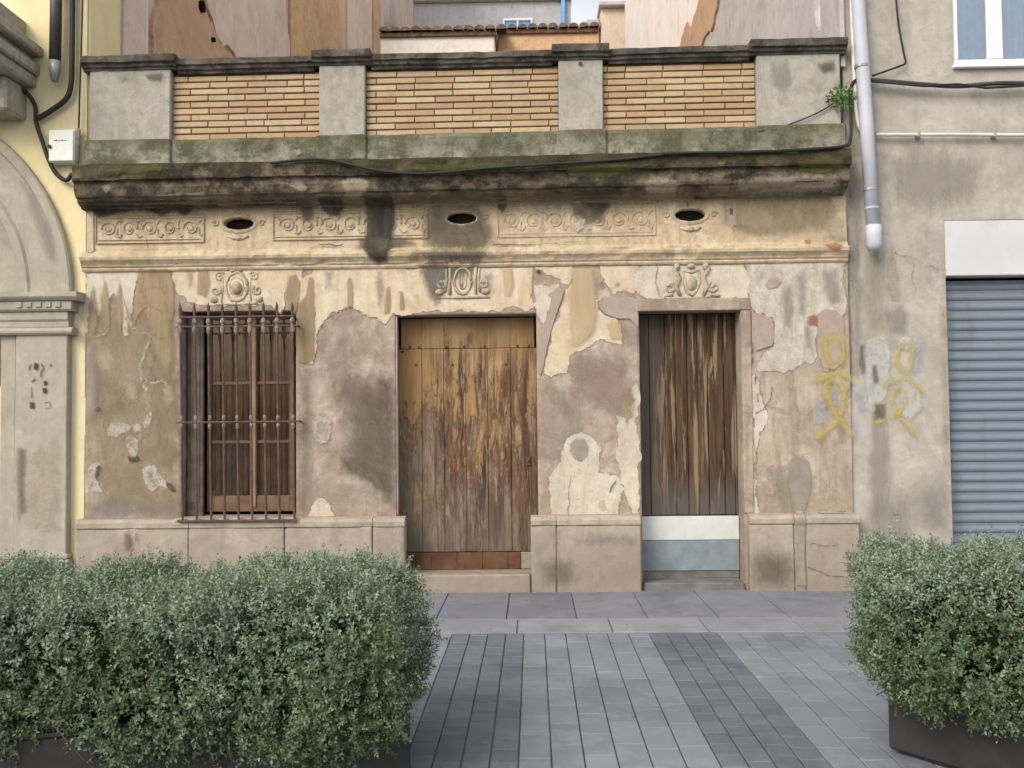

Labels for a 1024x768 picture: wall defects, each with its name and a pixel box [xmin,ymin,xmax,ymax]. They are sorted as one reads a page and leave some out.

leakage [360,195,411,264]
flaking render [82,271,138,333]
flaking render [172,262,847,518]
spalling [87,462,103,492]
spalling [107,410,176,492]